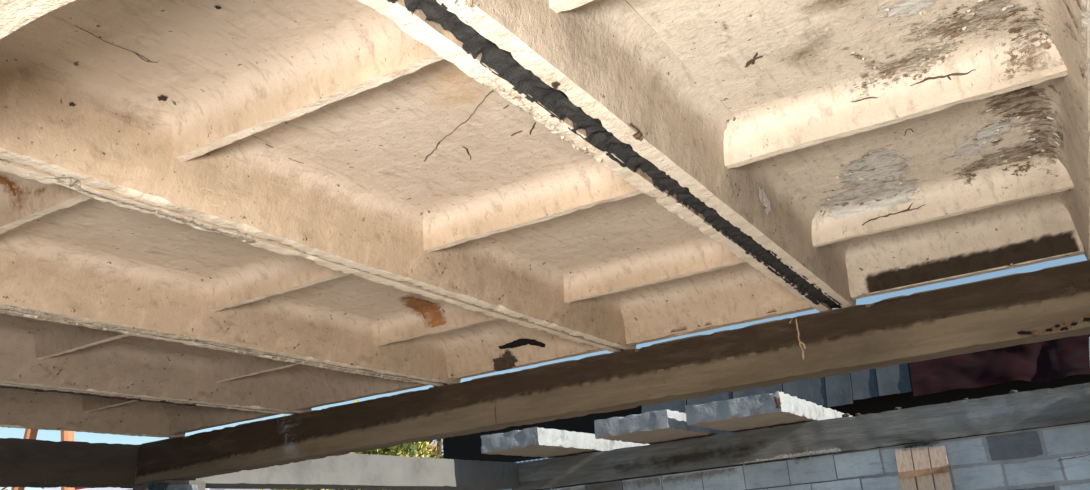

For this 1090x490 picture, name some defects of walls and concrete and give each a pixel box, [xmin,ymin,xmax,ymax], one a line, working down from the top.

crack [75,25,158,63]
crack [424,91,509,161]
crack [910,69,976,86]
peeling [843,0,1083,200]
water stain [1081,0,1090,84]
rust [0,176,23,208]
peeling [814,144,920,219]
rust [403,296,445,328]
water stain [137,261,1090,476]
water stain [582,446,840,490]